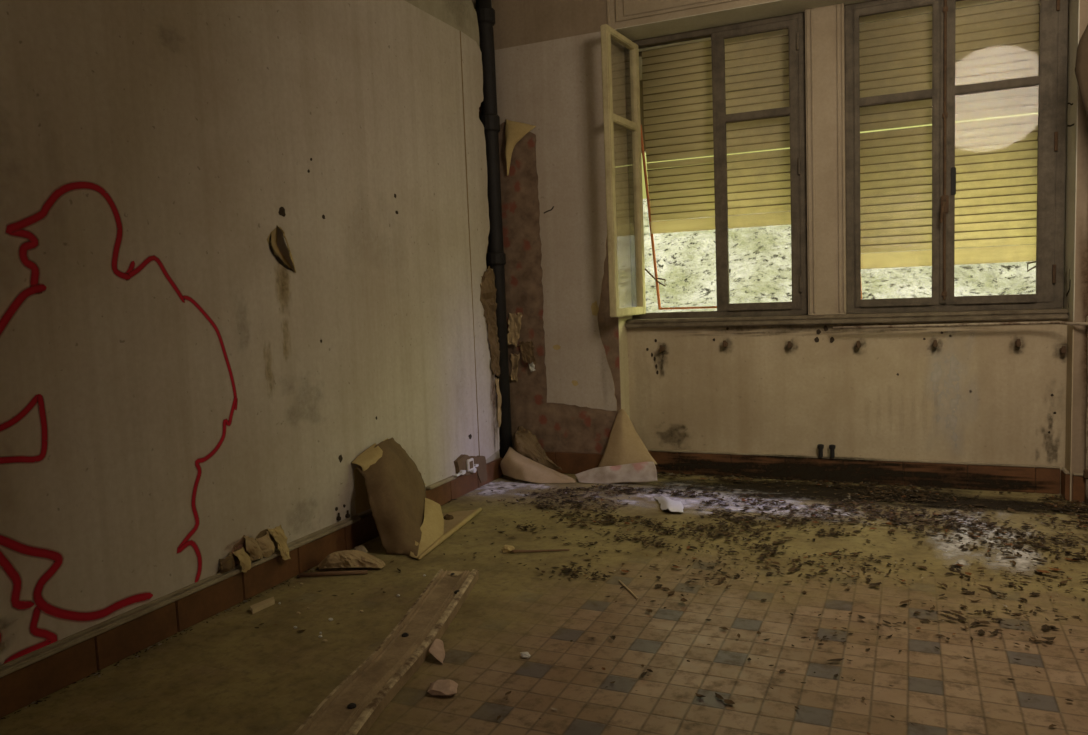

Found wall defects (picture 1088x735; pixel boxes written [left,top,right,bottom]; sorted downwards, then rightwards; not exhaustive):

peeling [267,226,296,272]
peeling [480,266,537,427]